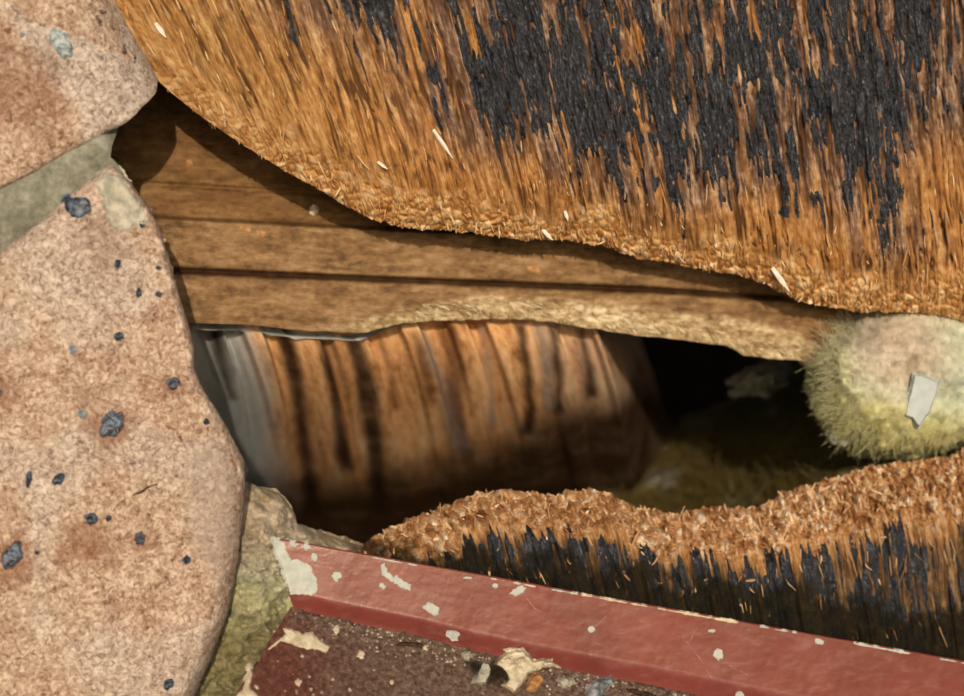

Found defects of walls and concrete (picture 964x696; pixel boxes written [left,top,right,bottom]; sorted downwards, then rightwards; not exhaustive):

peeling [271,537,318,596]
peeling [372,557,417,591]
peeling [269,628,330,653]
peeling [446,630,460,641]
peeling [236,663,258,696]
peeling [461,647,577,693]